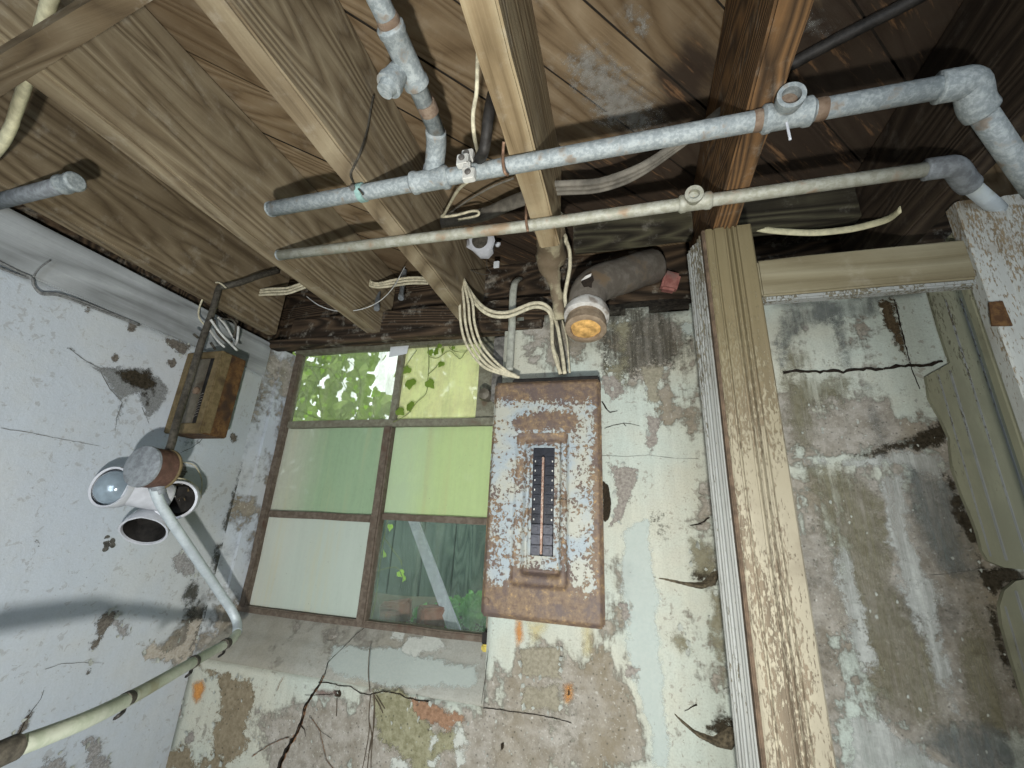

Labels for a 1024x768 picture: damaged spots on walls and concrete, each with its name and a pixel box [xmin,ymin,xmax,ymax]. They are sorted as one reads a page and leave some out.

peeling [165,336,194,368]
crack [783,300,943,389]
flaking render [640,366,669,455]
flaking render [603,462,639,527]
peeling [173,549,200,578]
flaking render [707,587,730,694]
leakage [807,466,939,718]
leakage [907,470,1023,768]
peeling [41,735,112,768]
flaking render [86,607,270,768]
crack [252,619,430,768]
flaking render [391,695,469,732]